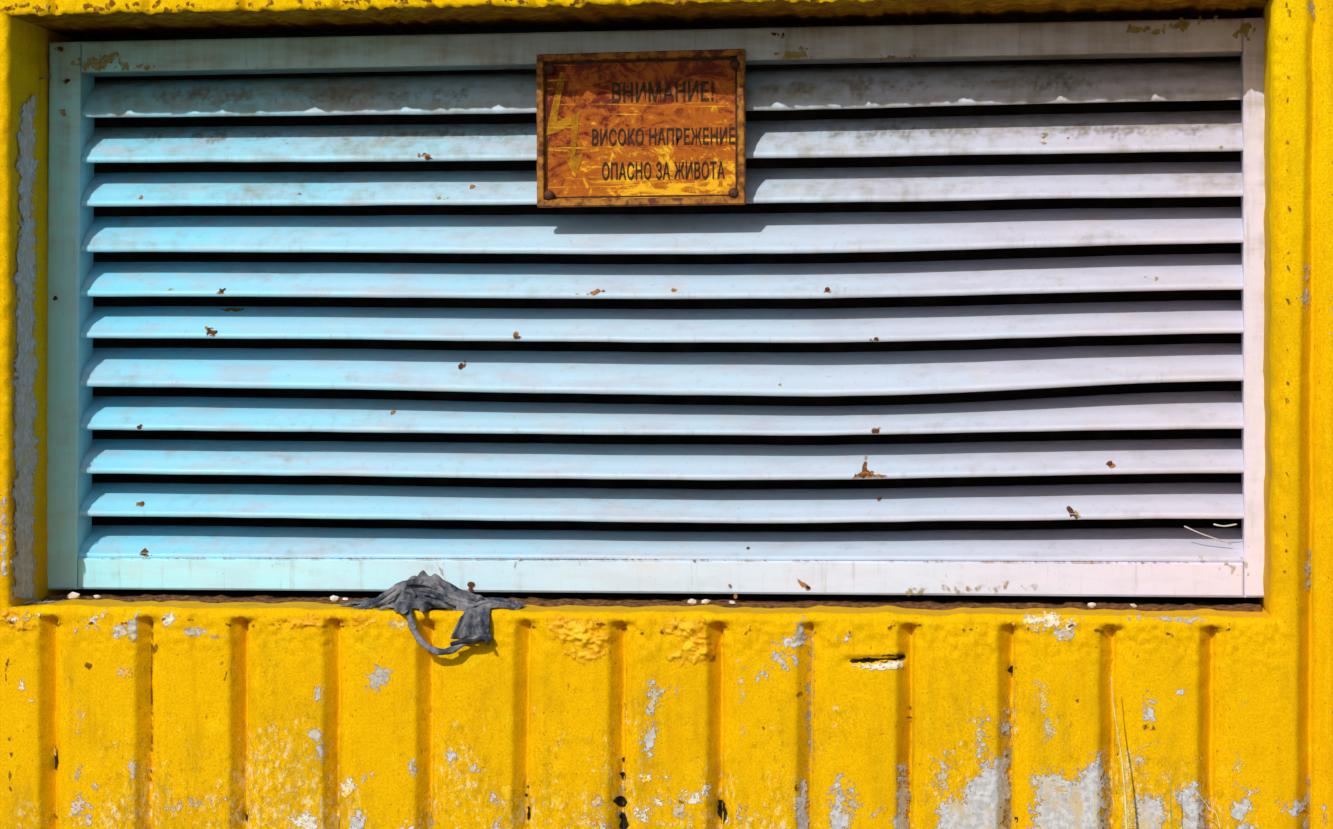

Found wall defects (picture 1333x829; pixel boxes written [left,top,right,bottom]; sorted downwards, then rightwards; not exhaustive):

rust [1126,15,1218,35]
rust [1233,23,1256,41]
rust [55,47,150,84]
peeling [0,95,231,643]
rust [853,456,887,479]
peeling [736,615,816,704]
peeling [638,679,678,758]
peeling [1142,690,1158,731]
peeling [932,708,1264,829]
peeling [633,774,712,827]
peeling [793,762,911,829]
peeling [1275,799,1306,817]